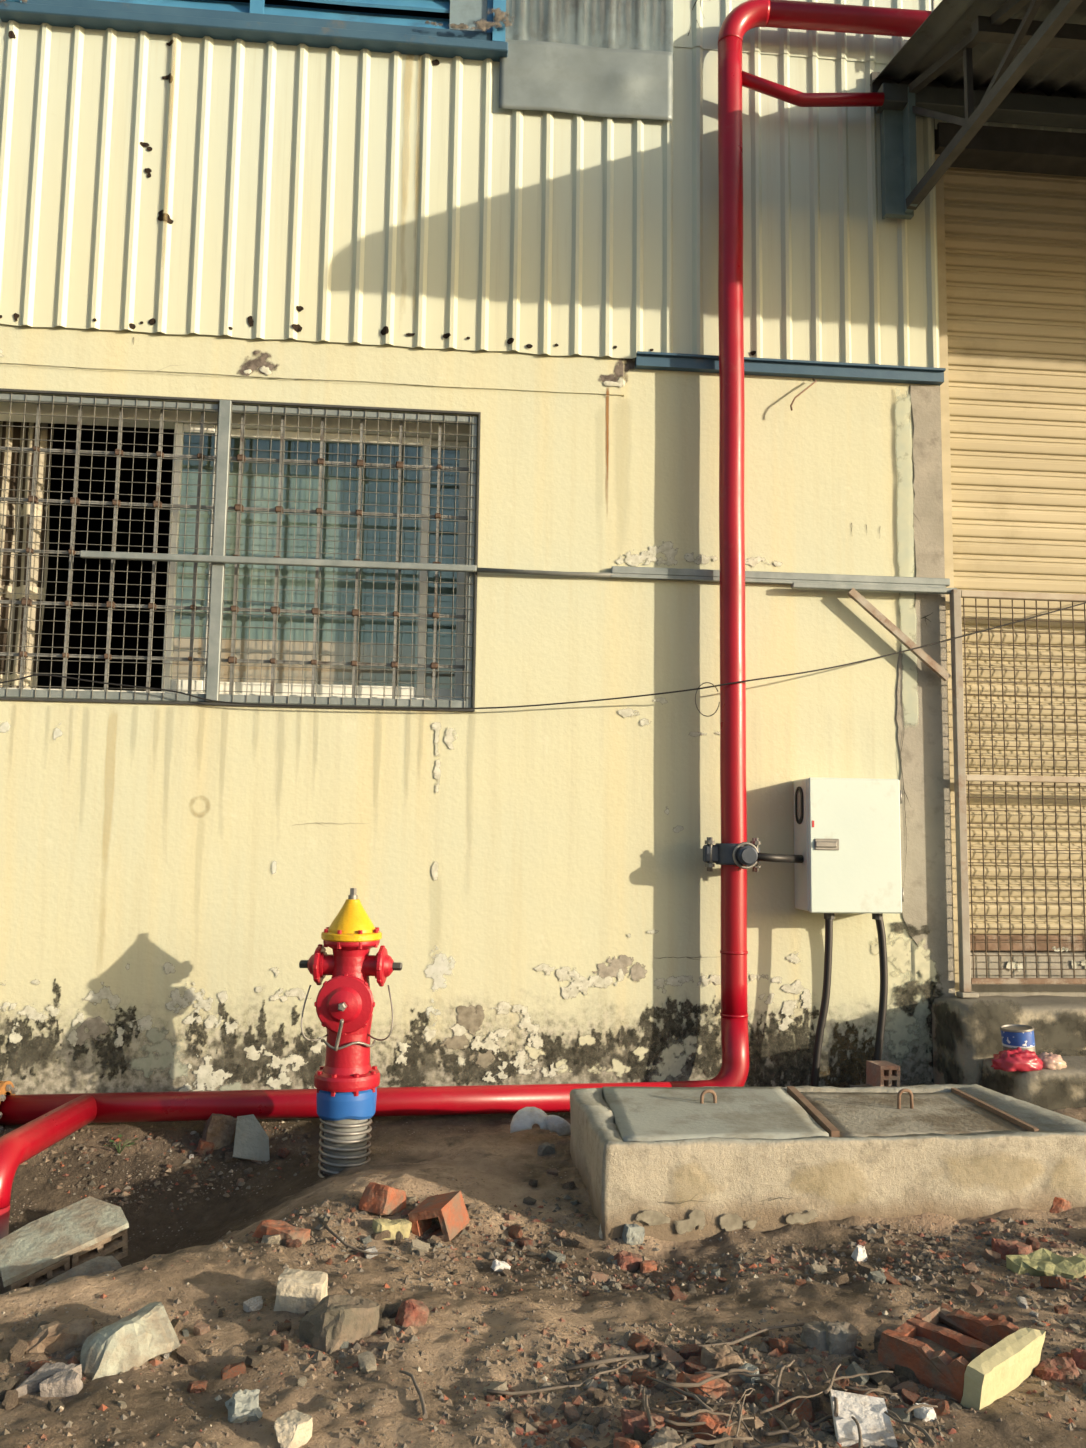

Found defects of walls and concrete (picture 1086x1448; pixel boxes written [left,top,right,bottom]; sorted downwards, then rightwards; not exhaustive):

peeling [609,541,718,566]
damp [0,979,140,1081]
damp [185,1000,326,1089]
damp [386,997,722,1087]
peeling [395,945,721,1082]
damp [746,999,875,1088]
damp [893,974,1086,1095]
damp [1033,1072,1086,1111]